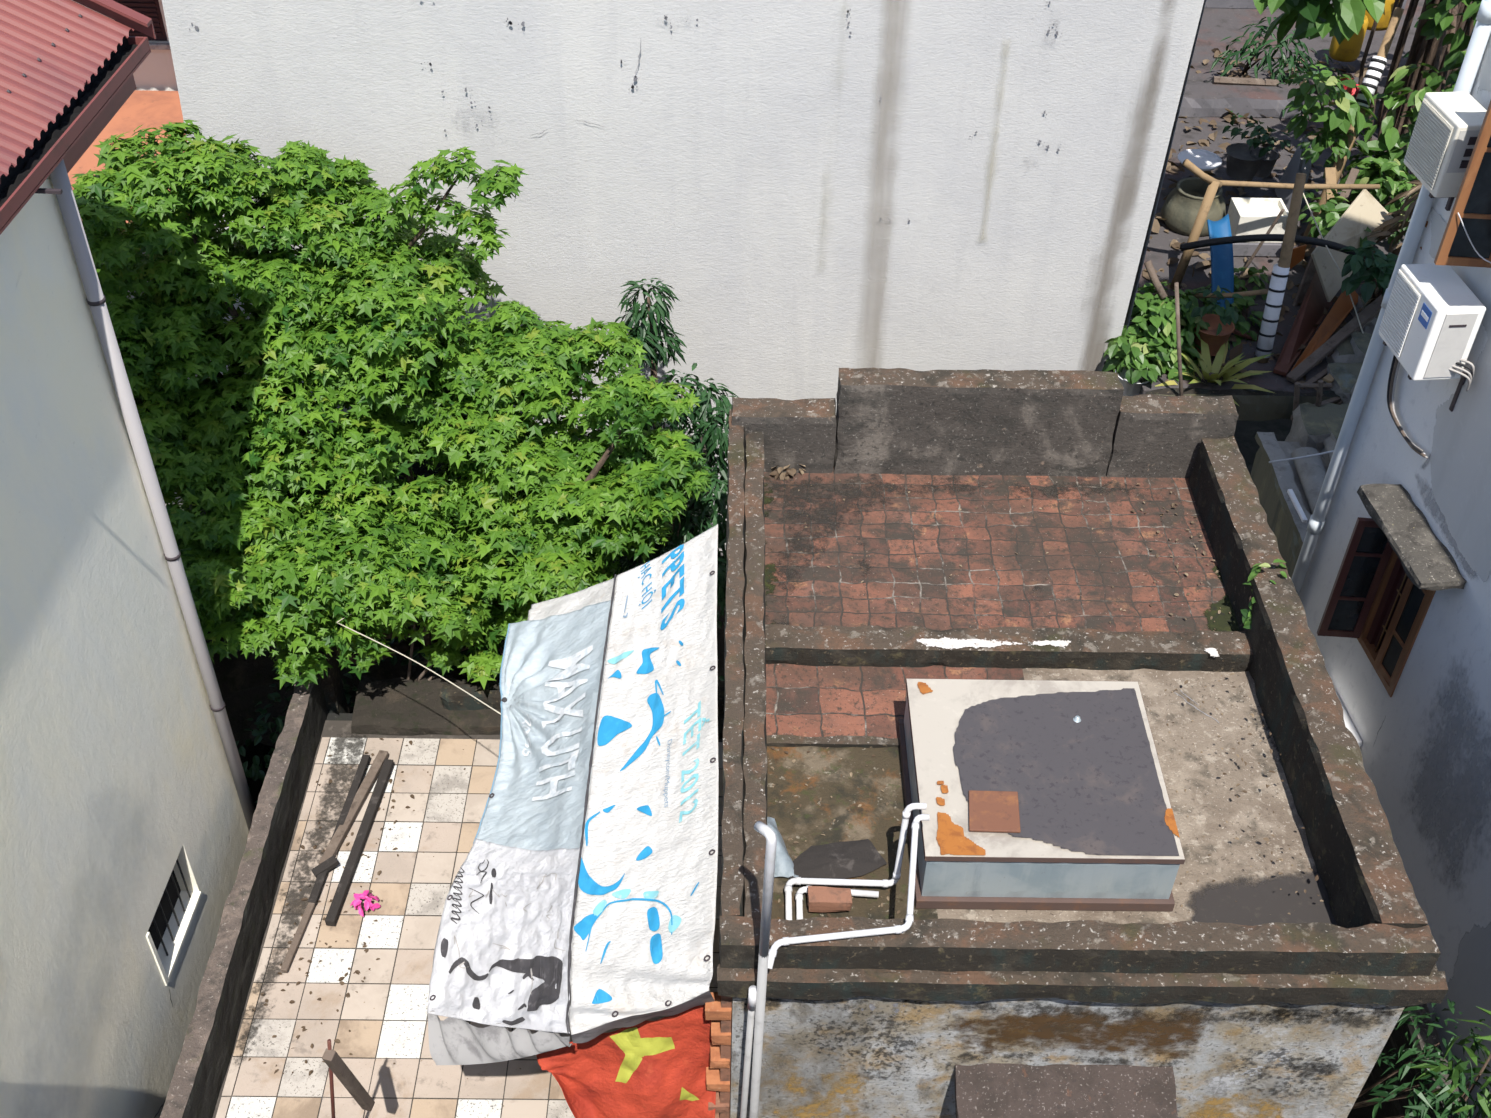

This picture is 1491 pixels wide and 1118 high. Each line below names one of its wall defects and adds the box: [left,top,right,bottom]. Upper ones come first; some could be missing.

leakage [1139,57,1160,136]
peeling [1477,33,1491,94]
leakage [1085,154,1140,371]
peeling [1421,266,1491,582]
leakage [1188,872,1336,926]
leakage [765,997,927,1084]
leakage [1091,1058,1176,1067]
leakage [1015,1002,1397,1028]
leakage [1231,1047,1342,1105]
peeling [1431,922,1491,1118]